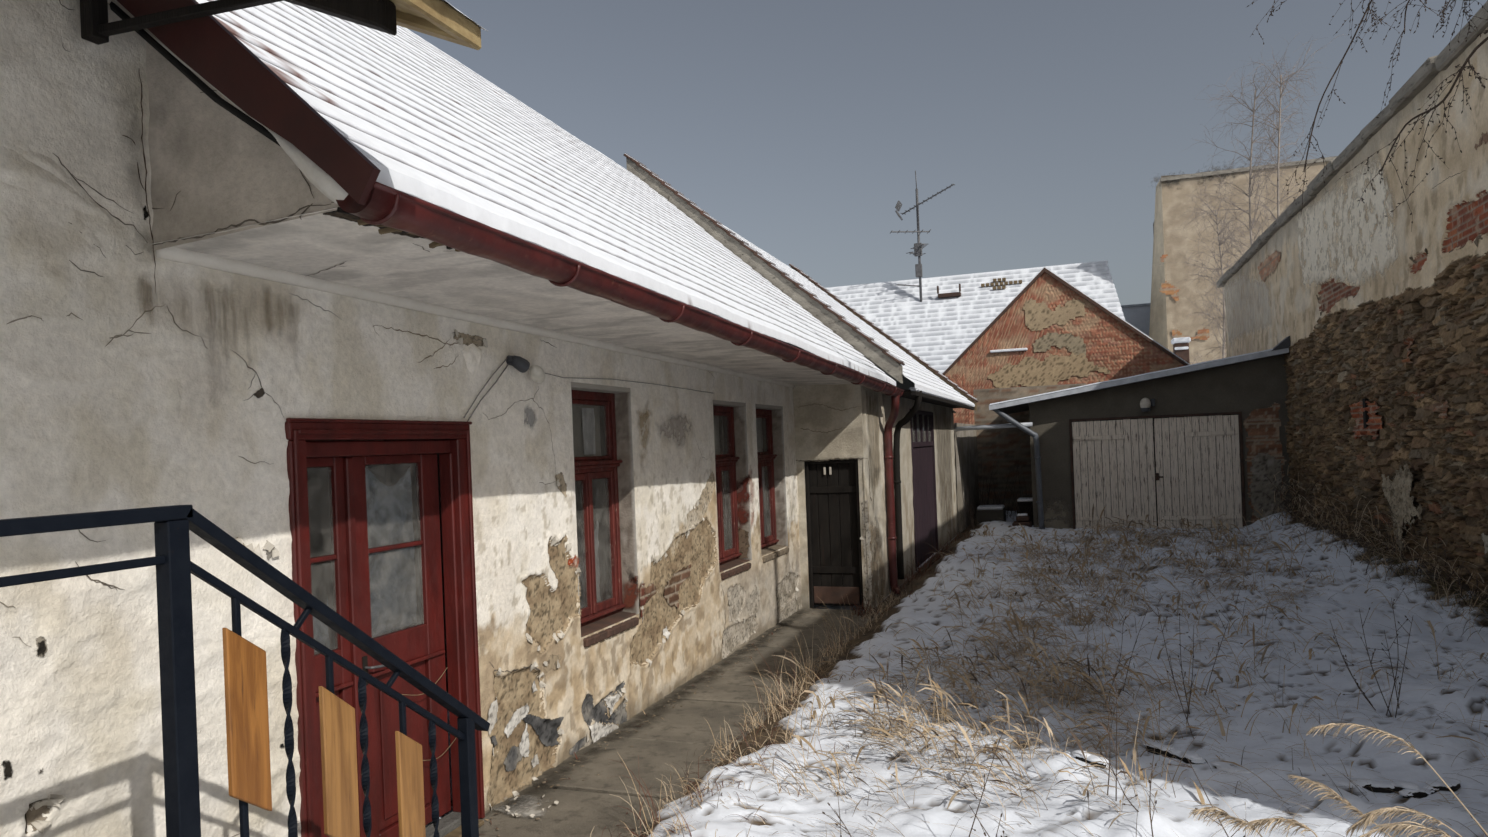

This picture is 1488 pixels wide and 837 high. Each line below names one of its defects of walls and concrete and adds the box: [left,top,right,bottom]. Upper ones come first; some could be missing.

crack [7,72,334,417]
flaking render [1316,277,1360,316]
flaking render [1409,190,1488,274]
flaking render [487,472,717,811]